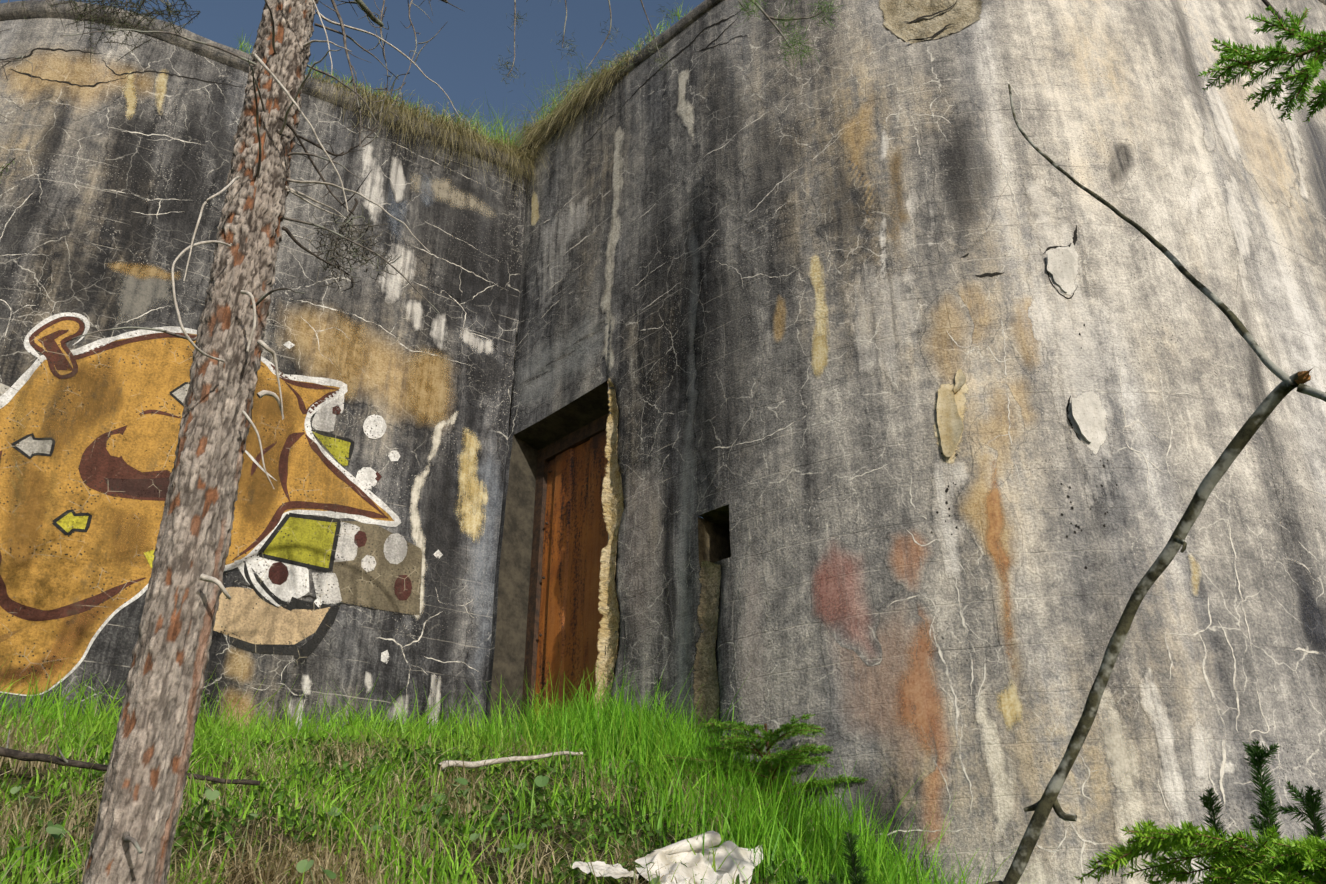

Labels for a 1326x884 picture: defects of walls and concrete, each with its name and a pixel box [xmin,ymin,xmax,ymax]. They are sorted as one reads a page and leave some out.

water stain [0,43,236,339]
crack [0,47,246,87]
crack [128,131,202,145]
water stain [270,125,625,732]
spalling [595,378,625,717]
water stain [617,146,788,743]
corrosion [820,526,957,857]
spalling [879,0,983,44]
peeling [933,369,969,464]
water stain [807,31,1118,508]
corrosion [954,444,1027,701]
crack [1158,518,1282,832]